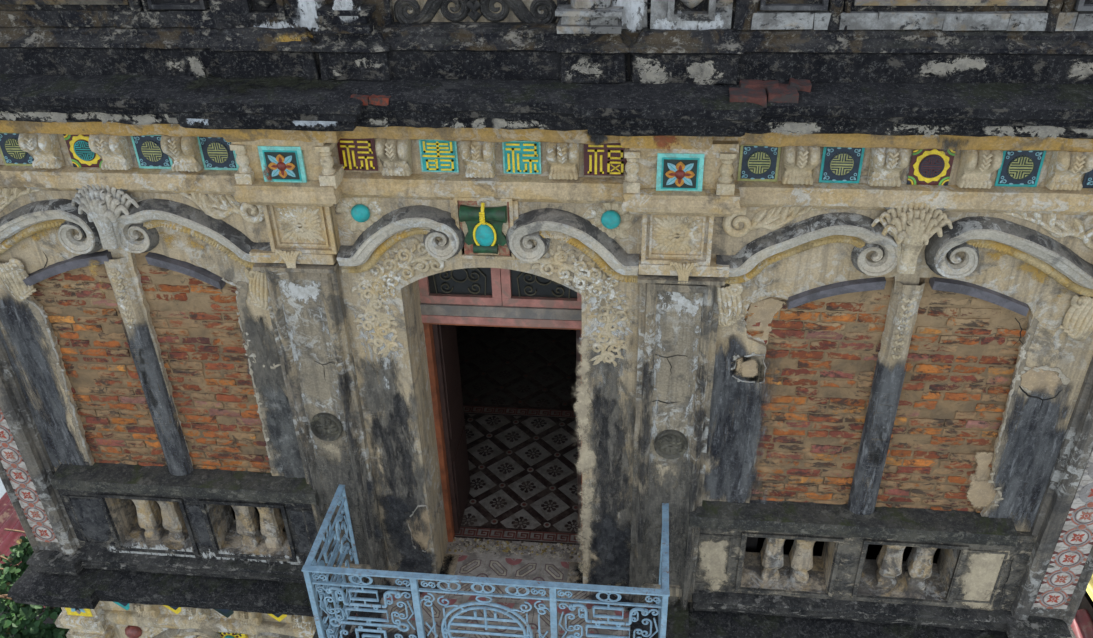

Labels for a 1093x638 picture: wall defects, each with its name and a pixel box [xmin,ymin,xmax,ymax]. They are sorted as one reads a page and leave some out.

peeling [25,298,91,464]
peeling [221,278,281,473]